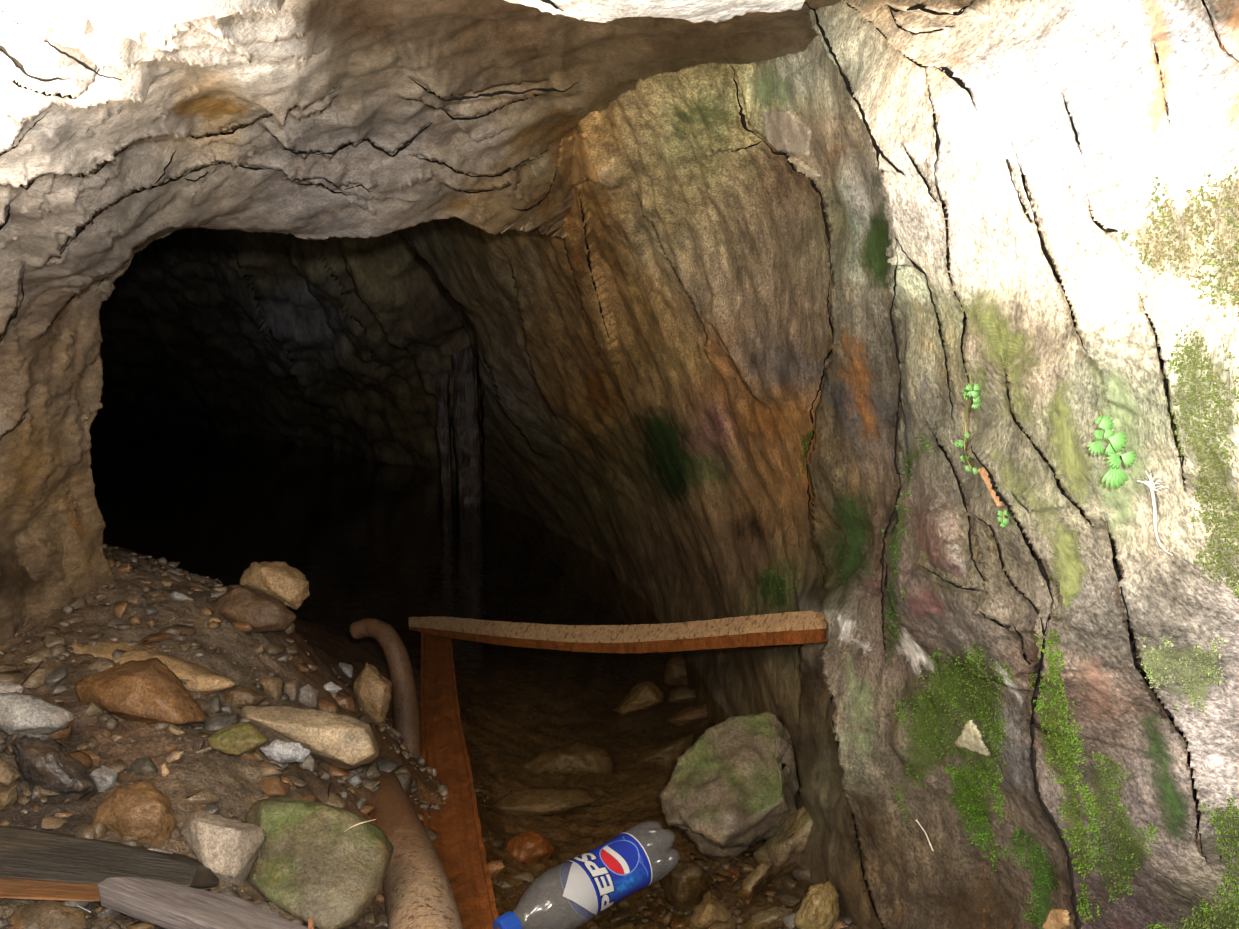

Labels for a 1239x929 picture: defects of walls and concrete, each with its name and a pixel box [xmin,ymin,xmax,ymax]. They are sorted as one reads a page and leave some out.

crack [0,9,121,230]
crack [0,77,610,341]
crack [541,0,564,12]
crack [1087,197,1118,233]
crack [1154,44,1170,123]
crack [804,0,1087,929]
crack [1139,295,1185,491]
crack [1003,365,1207,863]